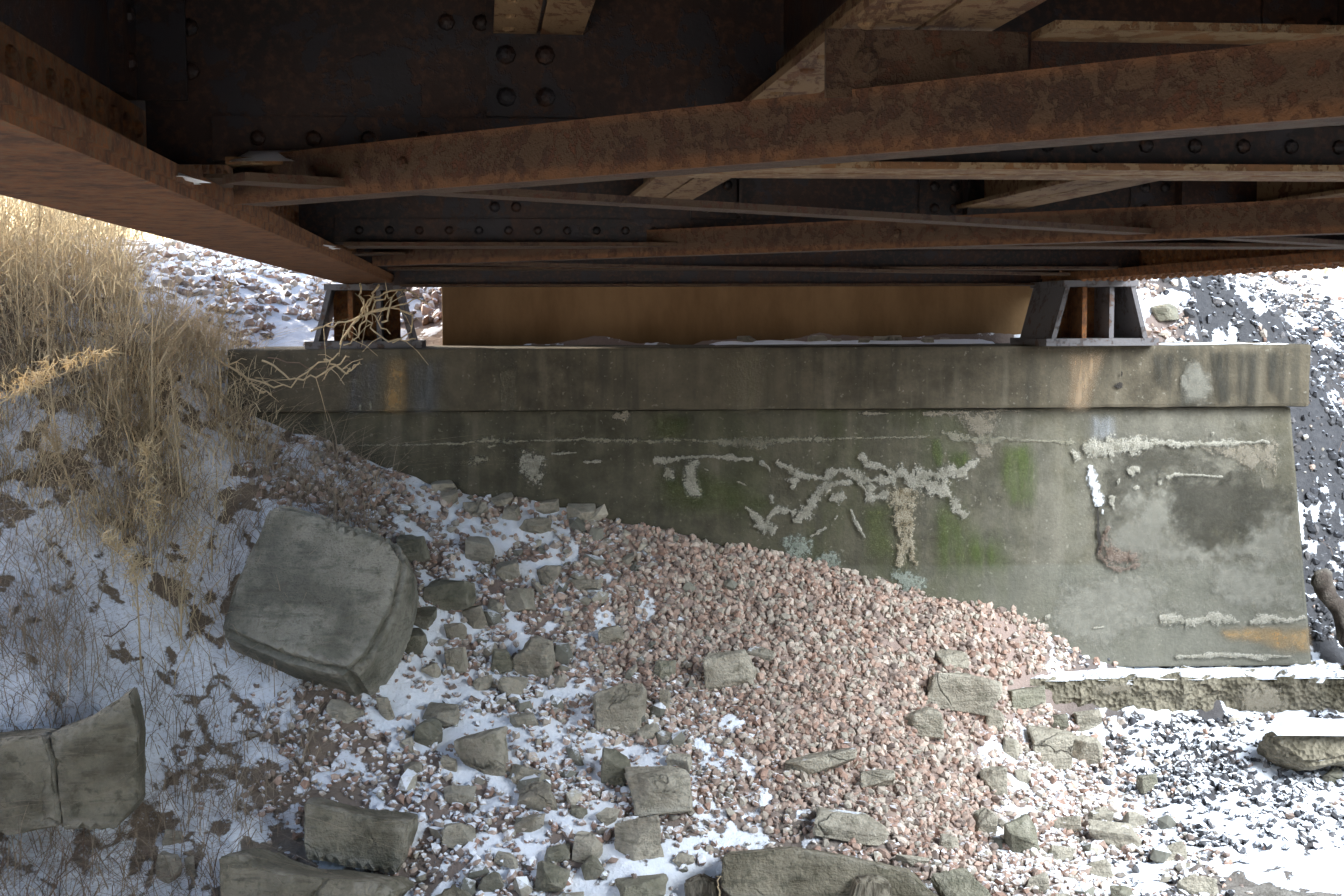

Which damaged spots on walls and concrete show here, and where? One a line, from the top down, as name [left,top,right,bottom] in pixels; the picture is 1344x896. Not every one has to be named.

water stain [344,411,1294,548]
water stain [886,487,924,568]